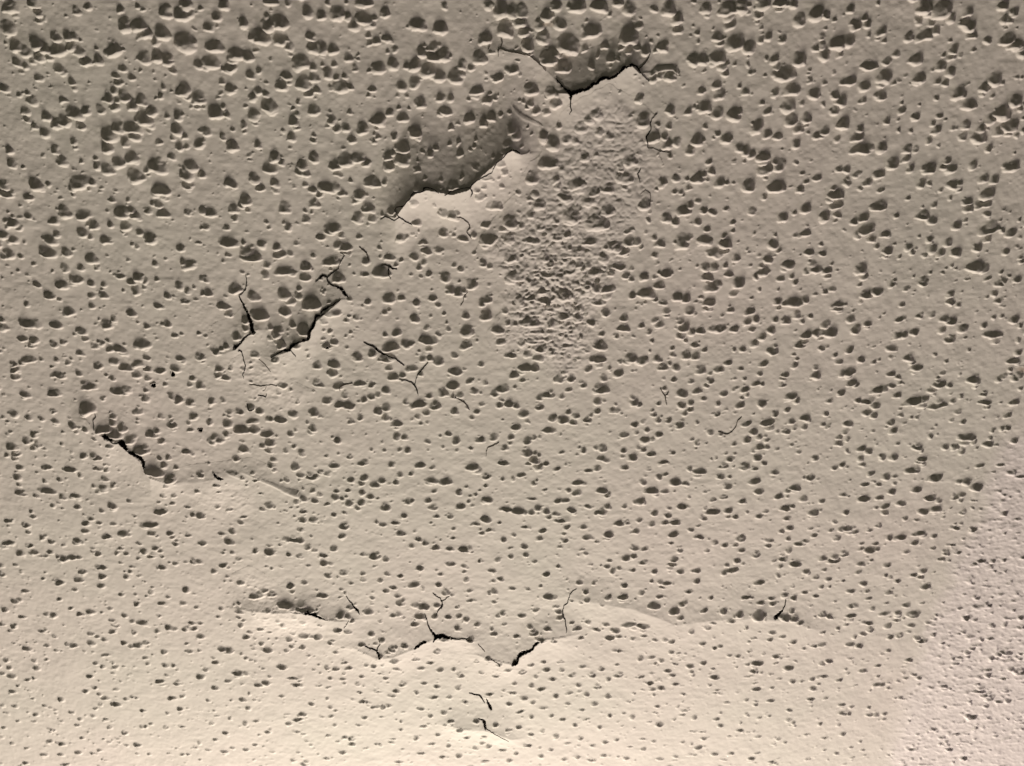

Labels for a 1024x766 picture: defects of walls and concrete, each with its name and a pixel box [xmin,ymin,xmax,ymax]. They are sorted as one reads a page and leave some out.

crack [488,40,651,114]
crack [380,149,520,238]
spalling [474,84,663,387]
crack [234,247,397,411]
crack [93,414,145,469]
crack [291,596,359,628]
crack [415,594,543,667]